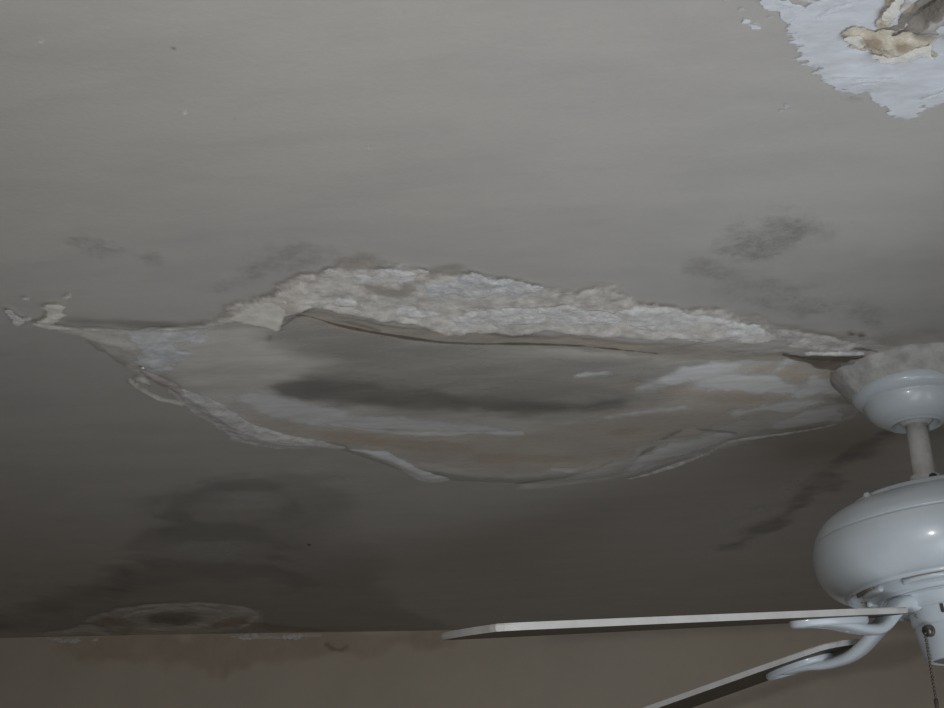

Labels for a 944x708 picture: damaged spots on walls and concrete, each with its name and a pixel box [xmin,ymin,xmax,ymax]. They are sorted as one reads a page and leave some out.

spalling [841,0,944,64]
peeling [5,261,886,376]
damp [128,369,524,483]
damp [50,602,259,635]